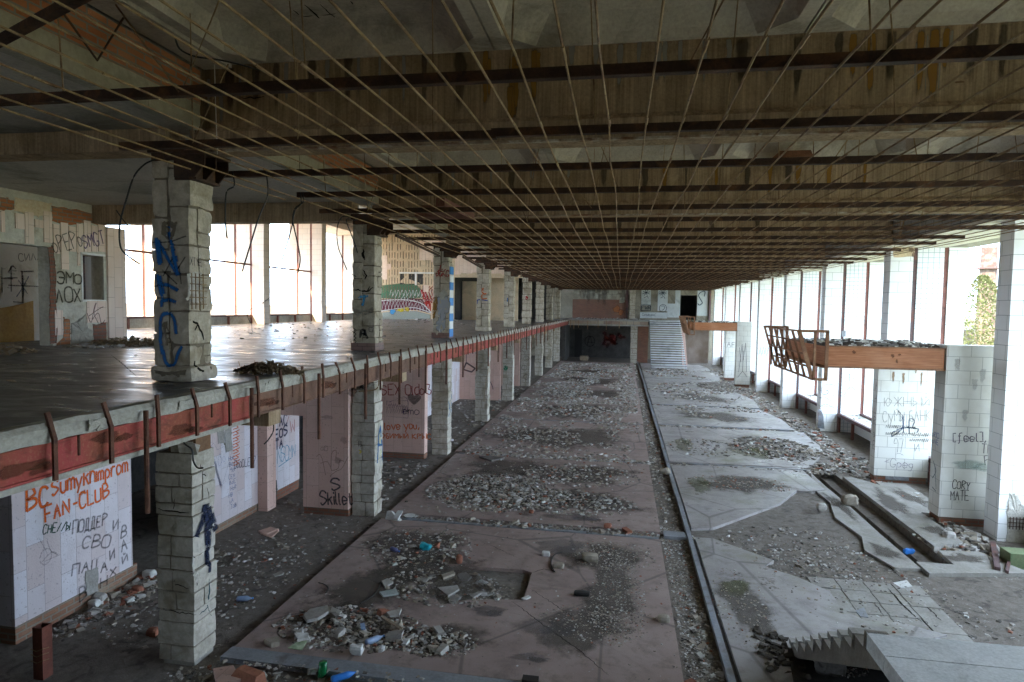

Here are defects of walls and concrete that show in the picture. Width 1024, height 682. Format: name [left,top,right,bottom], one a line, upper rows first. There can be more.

flaking render [0,197,98,225]
crack [193,321,212,372]
rust [91,431,132,443]
rust [170,424,203,436]
crack [163,580,212,616]